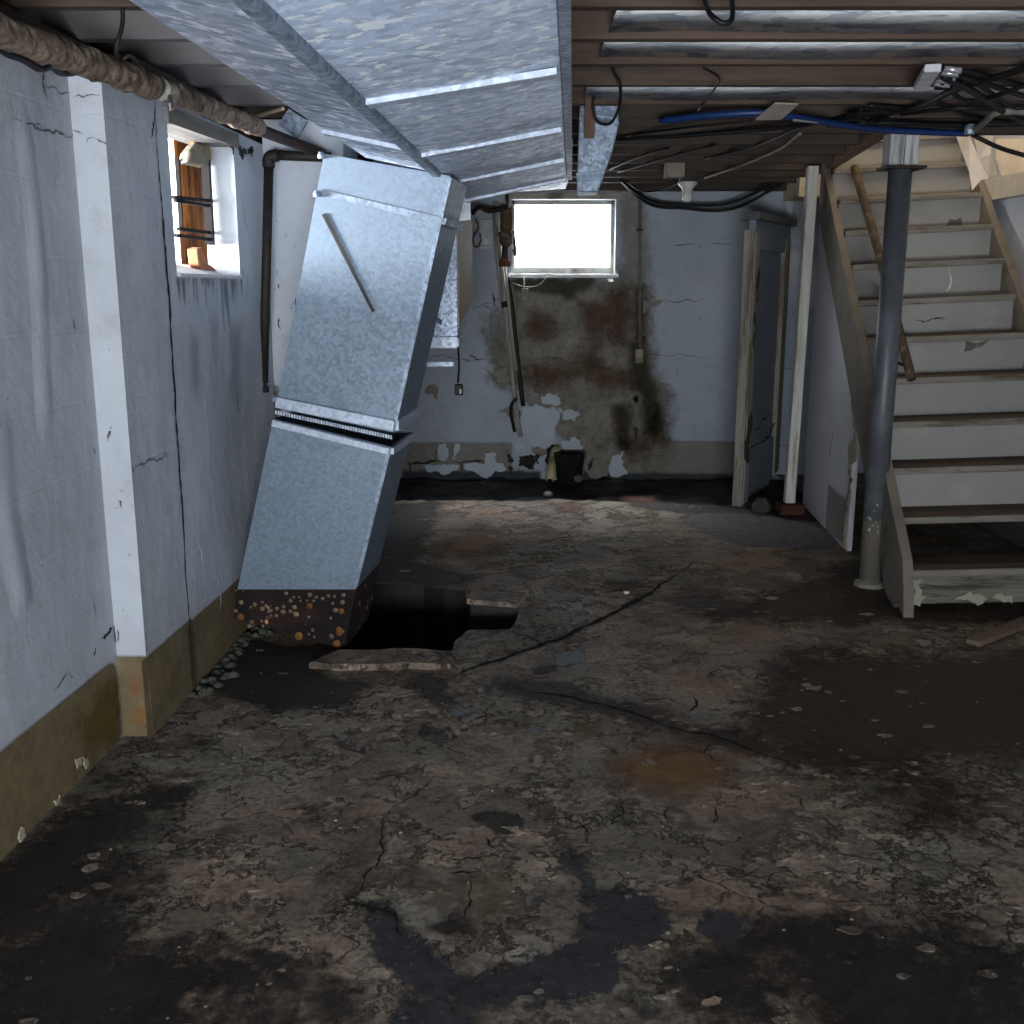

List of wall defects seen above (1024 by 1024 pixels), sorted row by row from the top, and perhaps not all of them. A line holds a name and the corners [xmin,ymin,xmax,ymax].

crack [13,118,109,147]
damp [488,191,735,481]
crack [131,100,204,679]
damp [401,443,541,482]
peeling [425,393,628,479]
peeling [682,400,859,549]
rust [234,589,346,628]
rust [329,627,345,648]
crack [454,561,806,769]
peeling [914,580,925,606]
peeling [955,591,1013,606]
damp [494,646,1024,830]